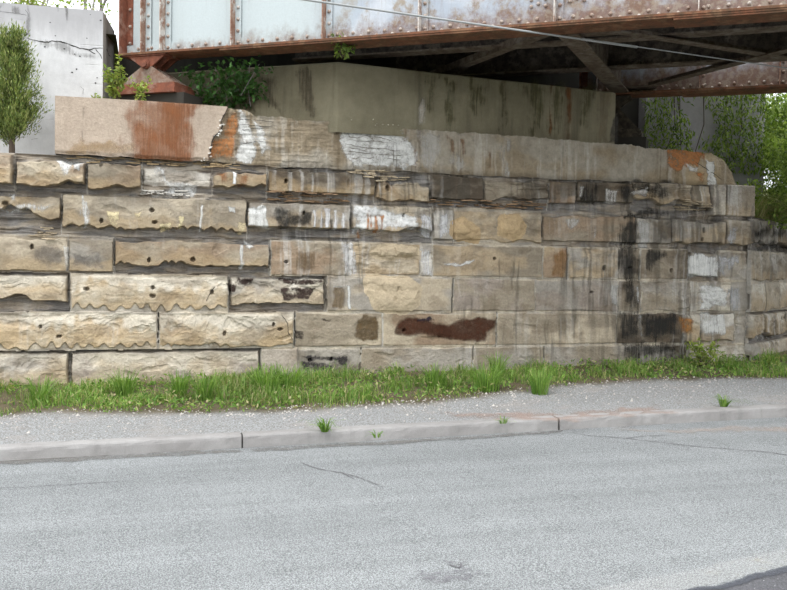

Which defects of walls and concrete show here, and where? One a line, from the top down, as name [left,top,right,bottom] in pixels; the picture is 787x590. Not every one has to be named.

crack [0,10,111,59]
rust [135,101,193,161]
rust [667,149,705,180]
water stain [580,180,671,204]
water stain [237,205,447,269]
water stain [345,243,356,274]
water stain [332,286,351,309]
water stain [612,207,676,362]